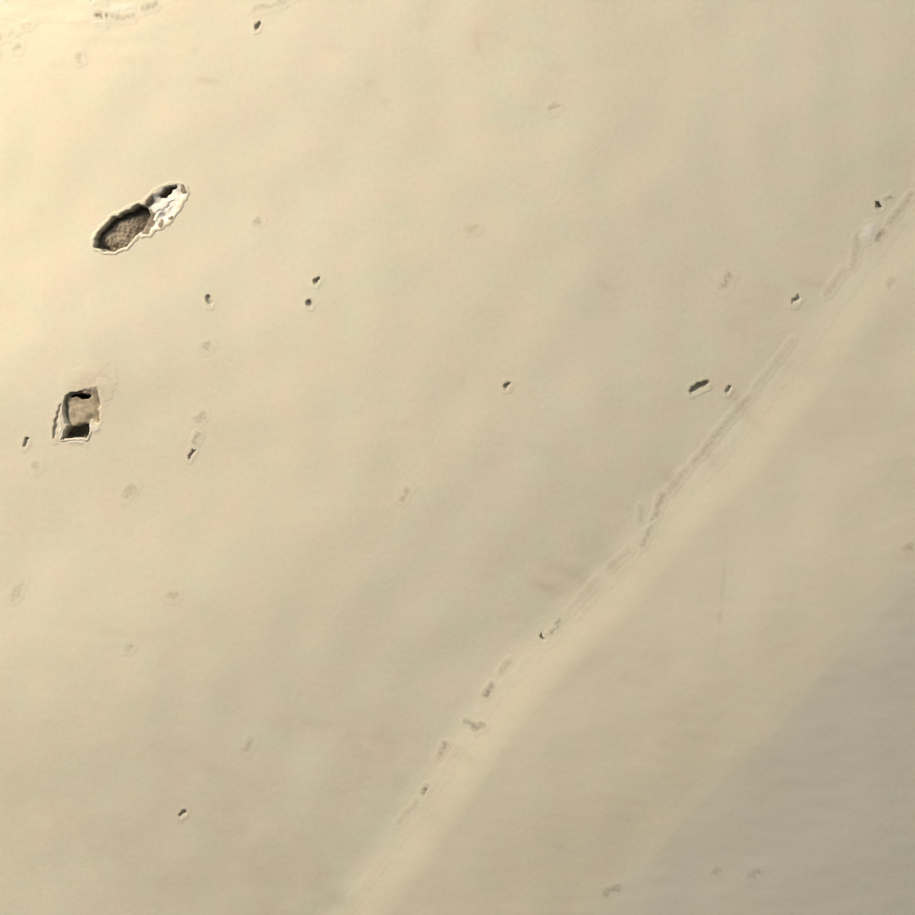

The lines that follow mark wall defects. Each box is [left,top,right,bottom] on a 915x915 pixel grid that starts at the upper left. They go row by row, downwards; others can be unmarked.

spalling [90,178,190,255]
spalling [48,359,118,448]